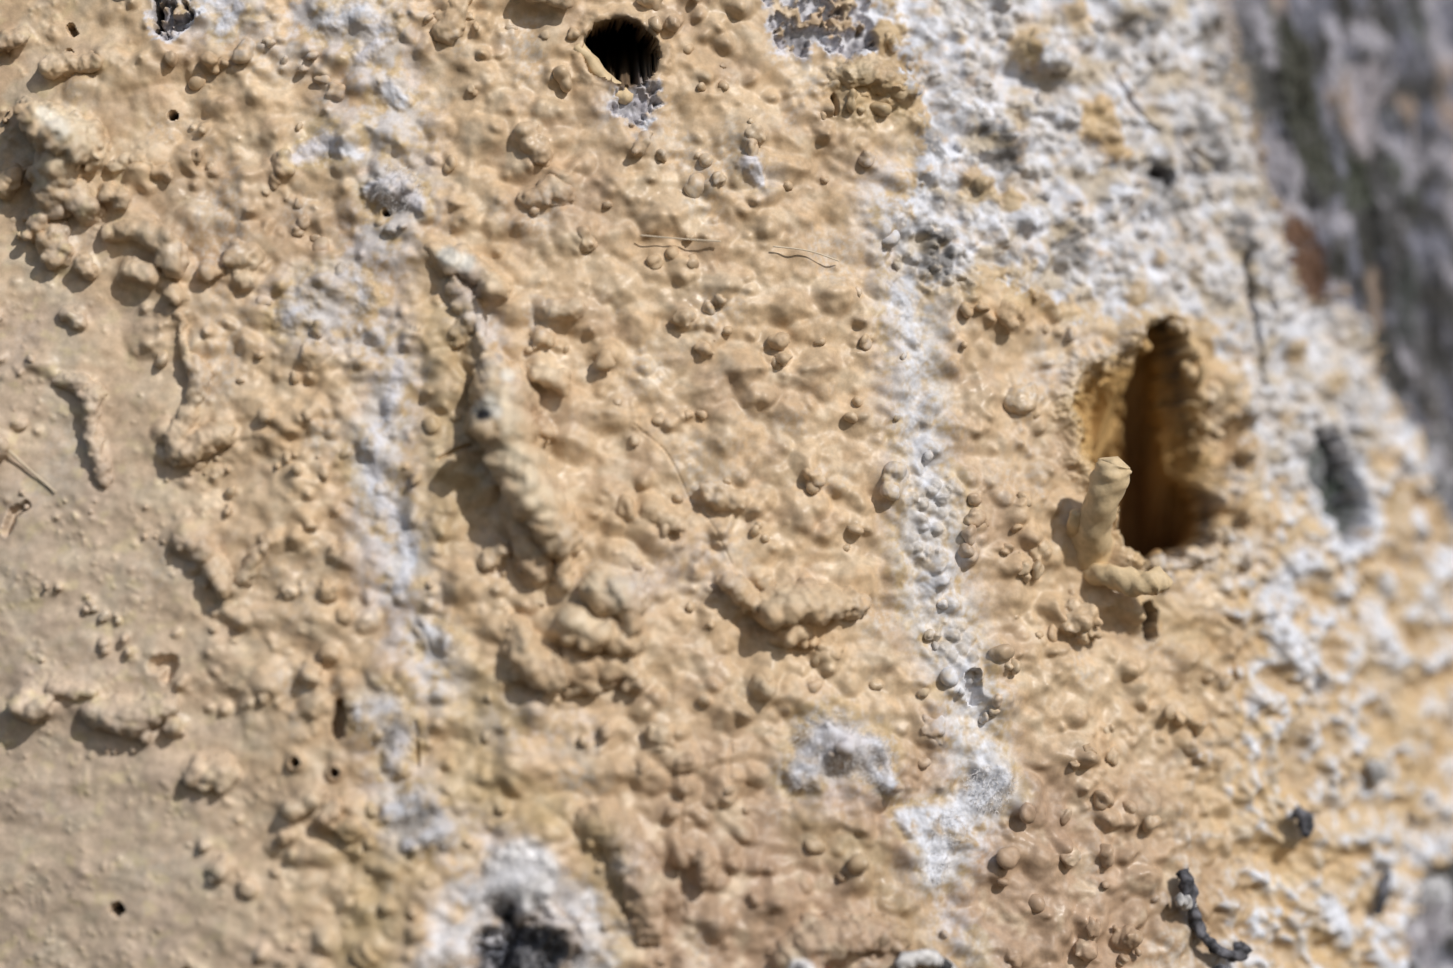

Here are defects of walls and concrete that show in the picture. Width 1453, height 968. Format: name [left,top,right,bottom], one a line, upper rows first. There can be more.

peeling [763,0,879,58]
spalling [1074,324,1217,560]
peeling [507,918,581,968]